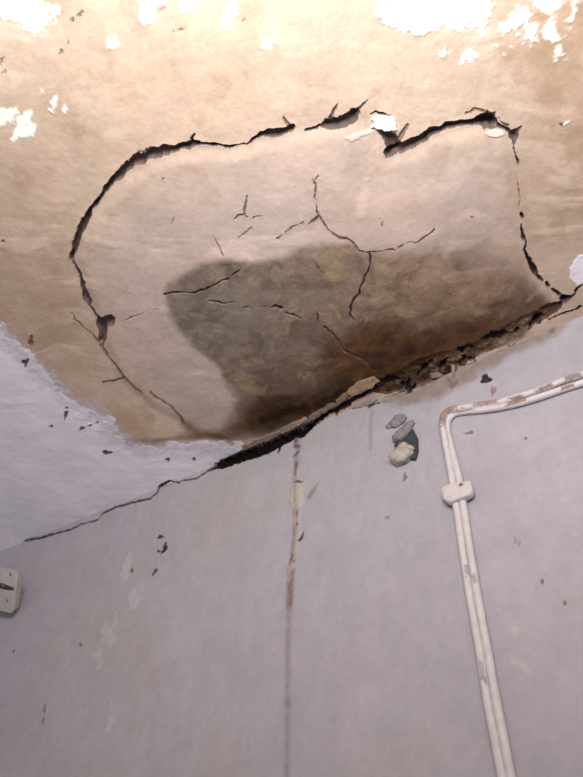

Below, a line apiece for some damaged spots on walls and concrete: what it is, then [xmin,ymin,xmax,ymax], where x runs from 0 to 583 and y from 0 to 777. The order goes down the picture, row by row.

peeling [0,0,85,35]
peeling [132,0,167,26]
peeling [374,0,496,38]
peeling [499,0,580,63]
peeling [0,106,37,144]
peeling [47,94,68,115]
spalling [304,99,397,142]
crack [376,106,582,321]
crack [68,116,296,426]
crack [275,175,436,321]
leakage [168,246,557,437]
crack [23,304,388,542]